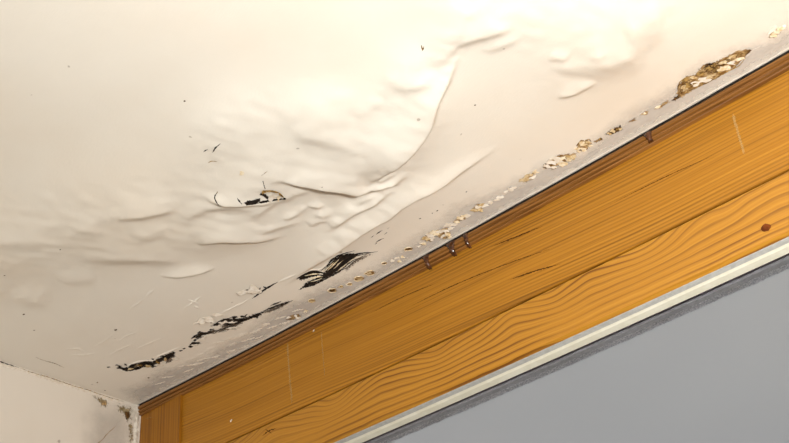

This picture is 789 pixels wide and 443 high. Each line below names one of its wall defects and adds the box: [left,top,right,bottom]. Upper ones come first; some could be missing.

flaking render [381,49,751,265]
peeling [237,230,386,299]
damp [226,281,360,351]